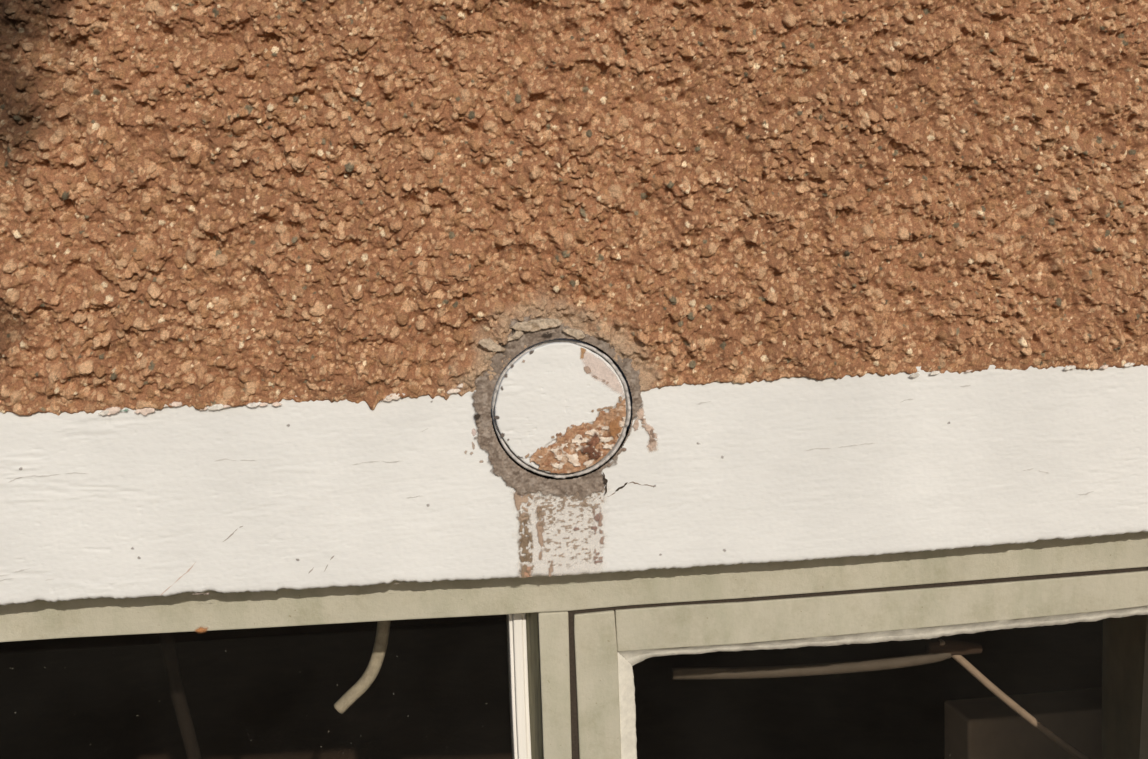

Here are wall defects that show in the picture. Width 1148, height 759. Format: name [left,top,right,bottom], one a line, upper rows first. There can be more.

spalling [447,315,657,578]